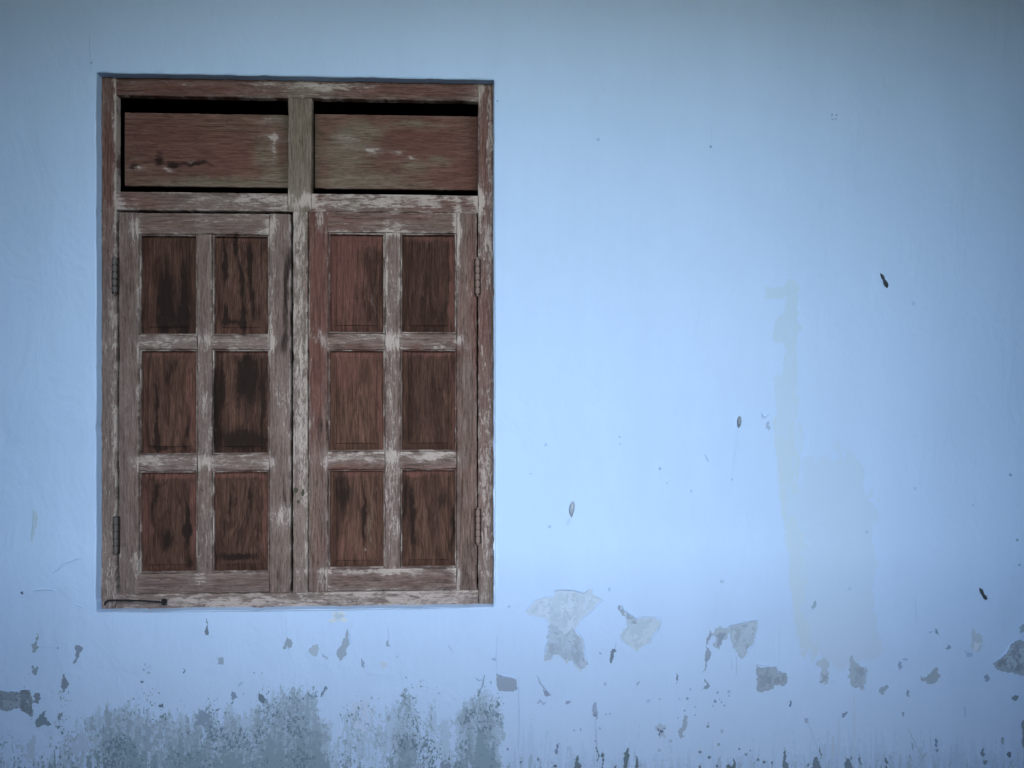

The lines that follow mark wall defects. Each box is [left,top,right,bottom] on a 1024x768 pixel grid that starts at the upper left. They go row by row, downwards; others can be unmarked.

peeling [309,612,350,661]
peeling [492,658,518,692]
peeling [525,588,602,672]
flaking render [610,605,662,663]
peeling [703,620,758,689]
peeling [756,666,788,692]
peeling [848,655,868,689]
peeling [984,624,1024,682]
peeling [0,690,63,729]
damp [0,674,522,768]